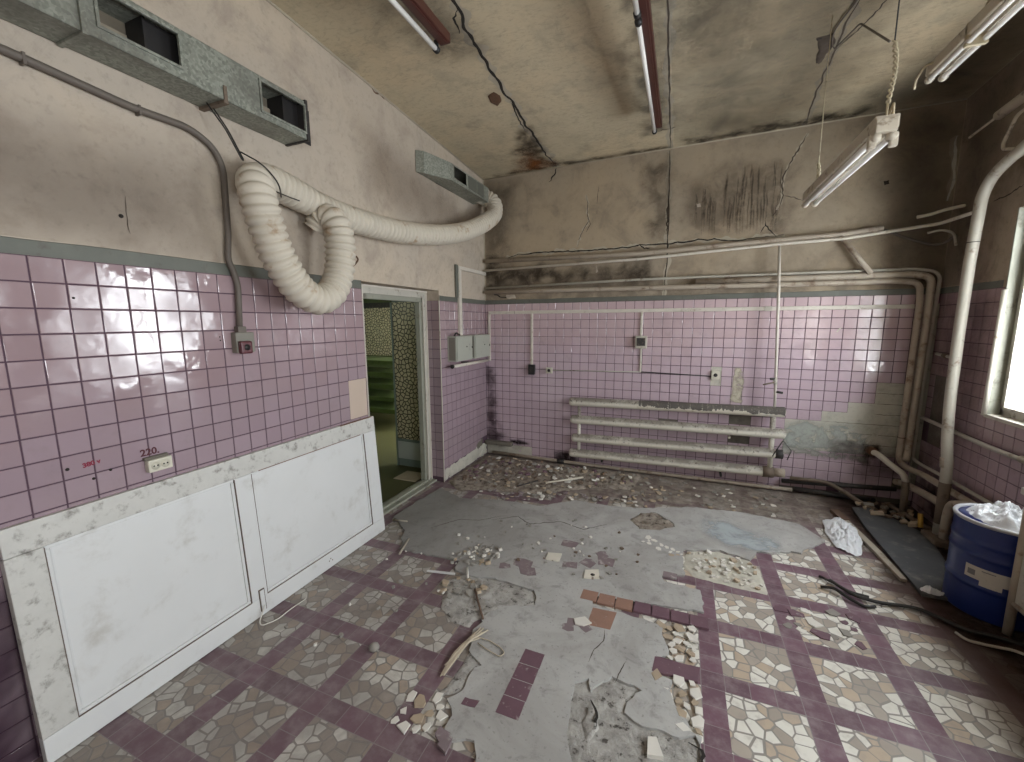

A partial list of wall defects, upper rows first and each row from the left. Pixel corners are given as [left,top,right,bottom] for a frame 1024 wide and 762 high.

crack [449,0,559,182]
crack [505,0,887,295]
leakage [486,263,588,287]
leakage [622,268,649,282]
peeling [637,383,913,462]
spalling [445,438,532,481]
flaking render [479,489,588,500]
spalling [621,496,674,530]
spalling [440,576,535,628]
spalling [443,653,480,696]
spalling [567,678,706,762]